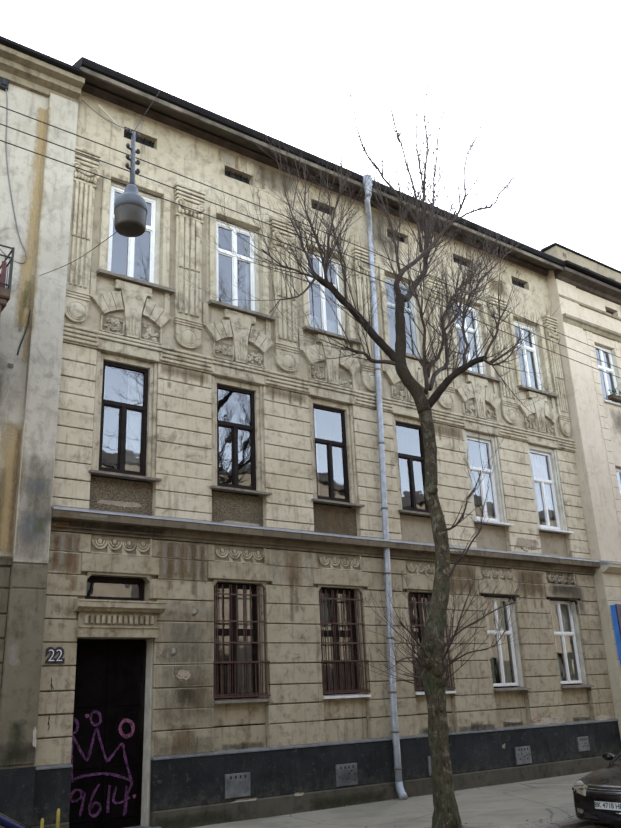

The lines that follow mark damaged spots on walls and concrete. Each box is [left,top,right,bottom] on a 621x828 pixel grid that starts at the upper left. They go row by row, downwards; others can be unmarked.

water stain [18,109,49,360]
water stain [0,423,21,551]